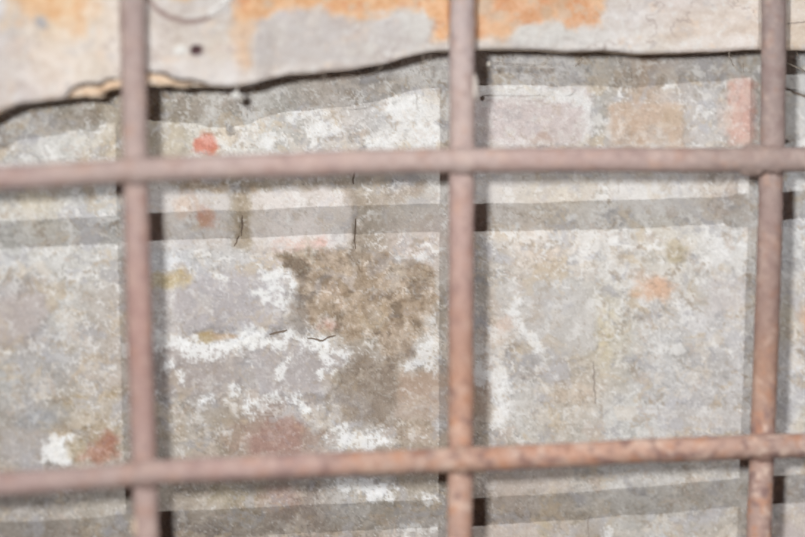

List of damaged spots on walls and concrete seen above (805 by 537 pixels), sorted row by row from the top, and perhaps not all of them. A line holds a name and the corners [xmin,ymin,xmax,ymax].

crack [66,77,116,97]
peeling [67,77,121,98]
crack [146,71,208,85]
peeling [146,73,210,88]
crack [786,87,805,98]
crack [234,215,244,246]
crack [351,218,359,249]
crack [269,328,287,336]
leakage [152,221,446,452]
crack [307,334,336,342]
leakage [331,475,447,509]